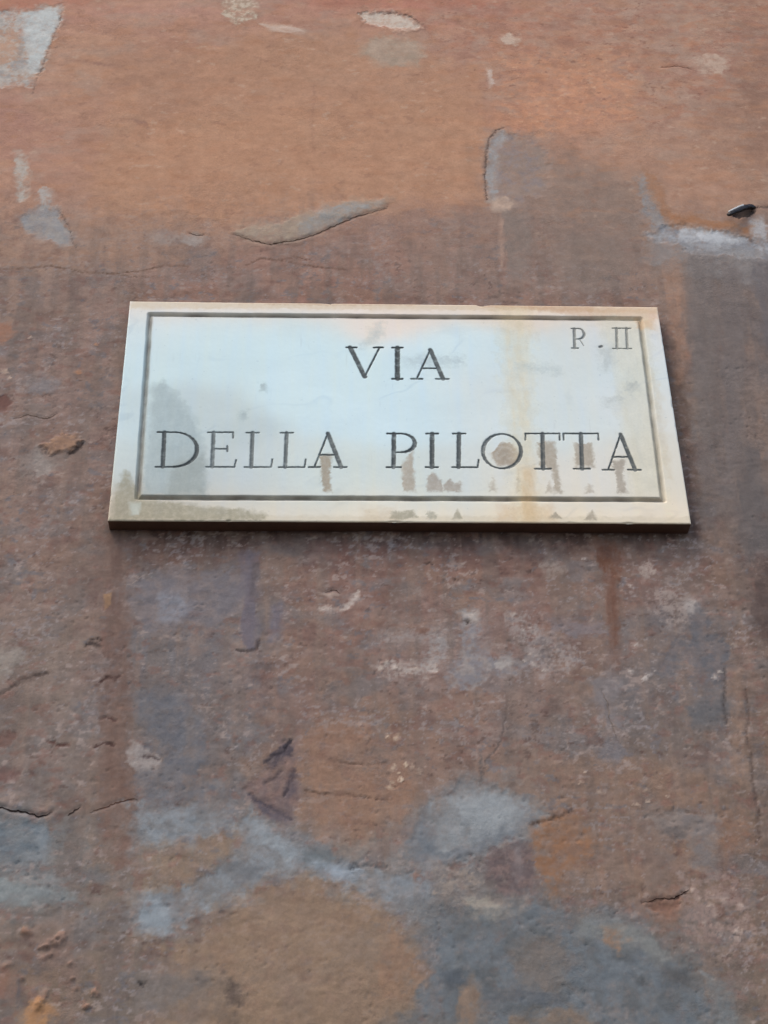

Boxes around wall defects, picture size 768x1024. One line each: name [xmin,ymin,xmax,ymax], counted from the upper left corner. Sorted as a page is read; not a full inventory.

flaking render [0,0,72,95]
spalling [352,8,431,70]
flaking render [8,147,80,249]
leakage [490,201,646,305]
spalling [12,430,86,483]
crack [0,798,137,818]